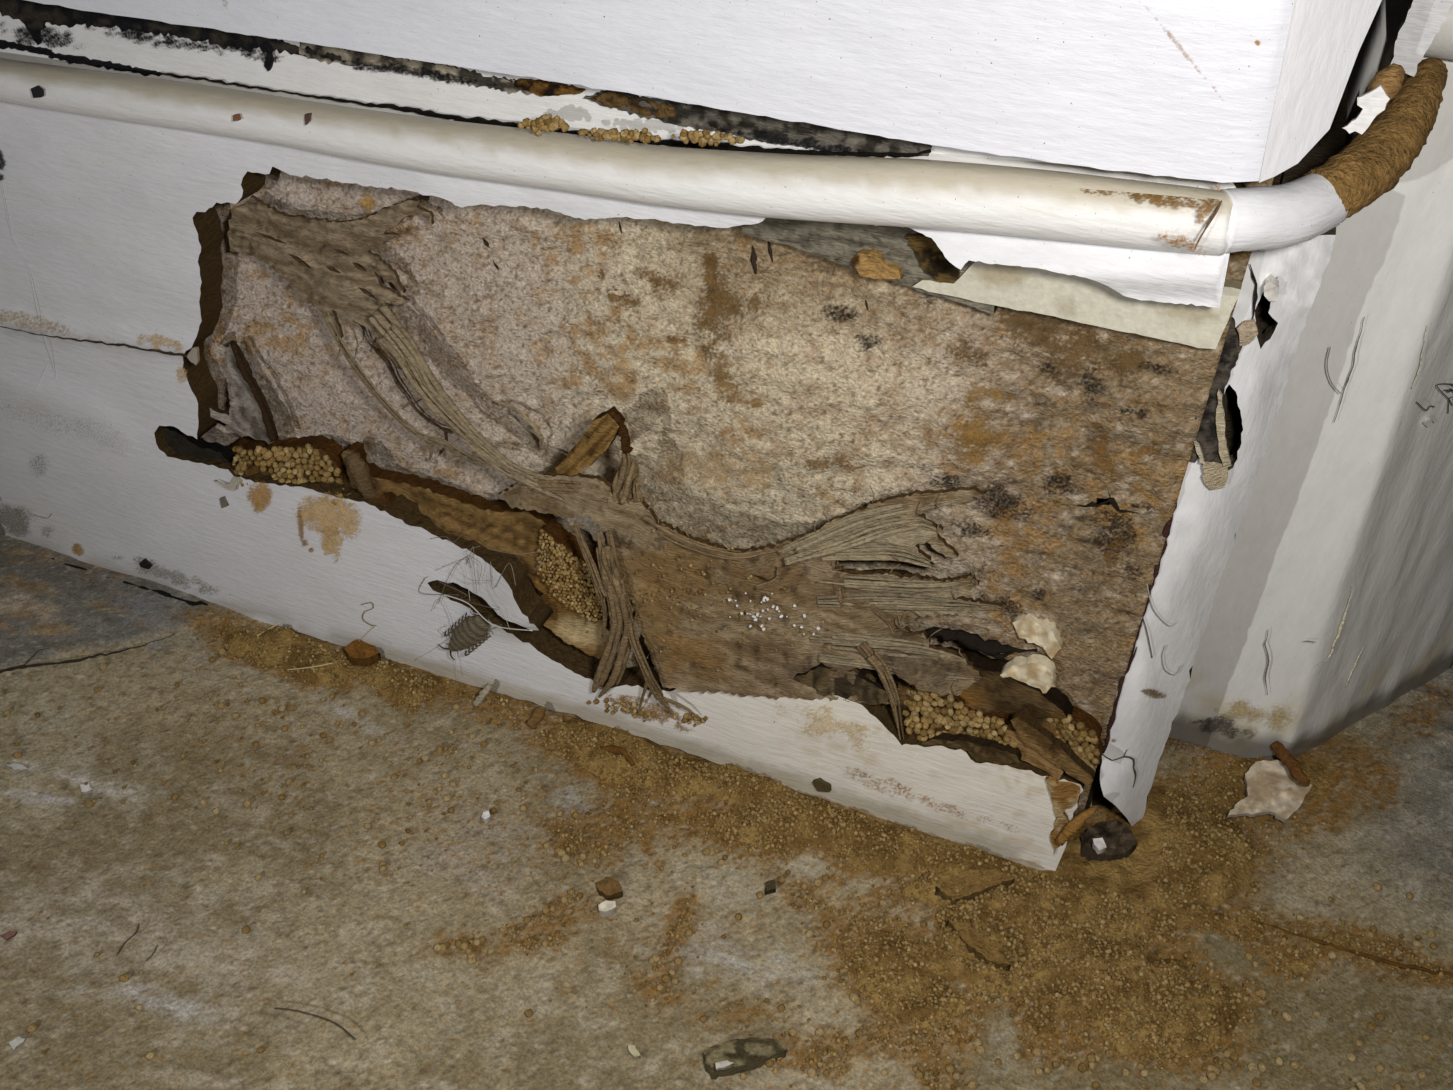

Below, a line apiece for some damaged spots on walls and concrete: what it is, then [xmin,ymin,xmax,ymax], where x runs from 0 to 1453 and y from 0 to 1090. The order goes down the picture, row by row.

peeling [583,90,932,157]
spalling [750,241,773,274]
peeling [187,347,200,365]
peeling [1189,317,1258,490]
crack [0,558,208,673]